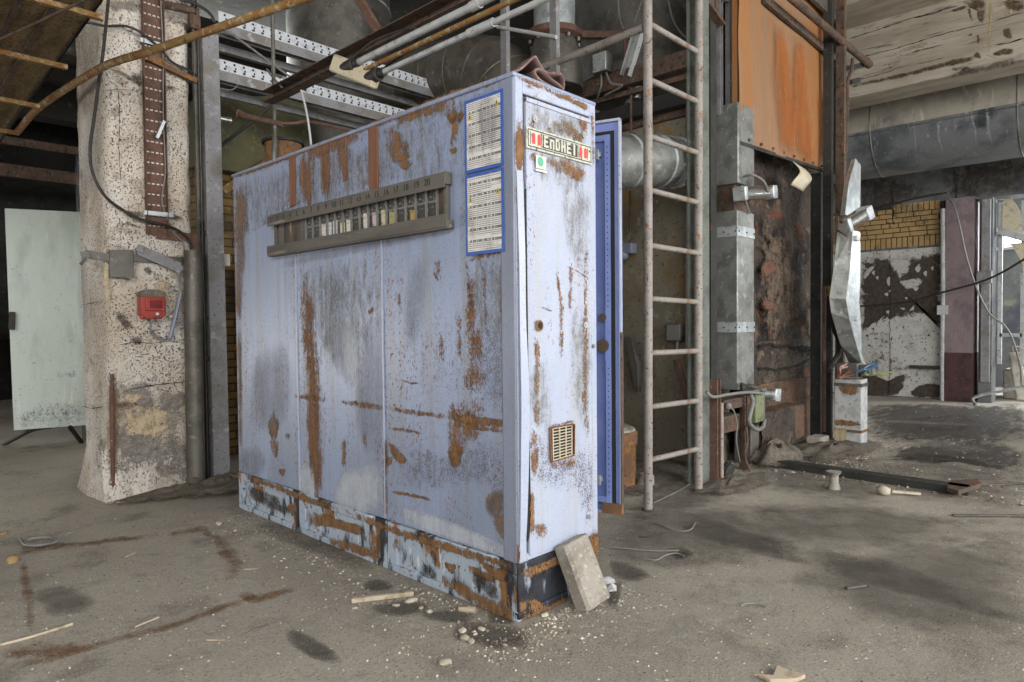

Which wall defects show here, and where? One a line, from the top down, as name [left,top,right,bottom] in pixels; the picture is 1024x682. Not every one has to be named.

spalling [760,208,810,349]
peeling [859,253,941,398]